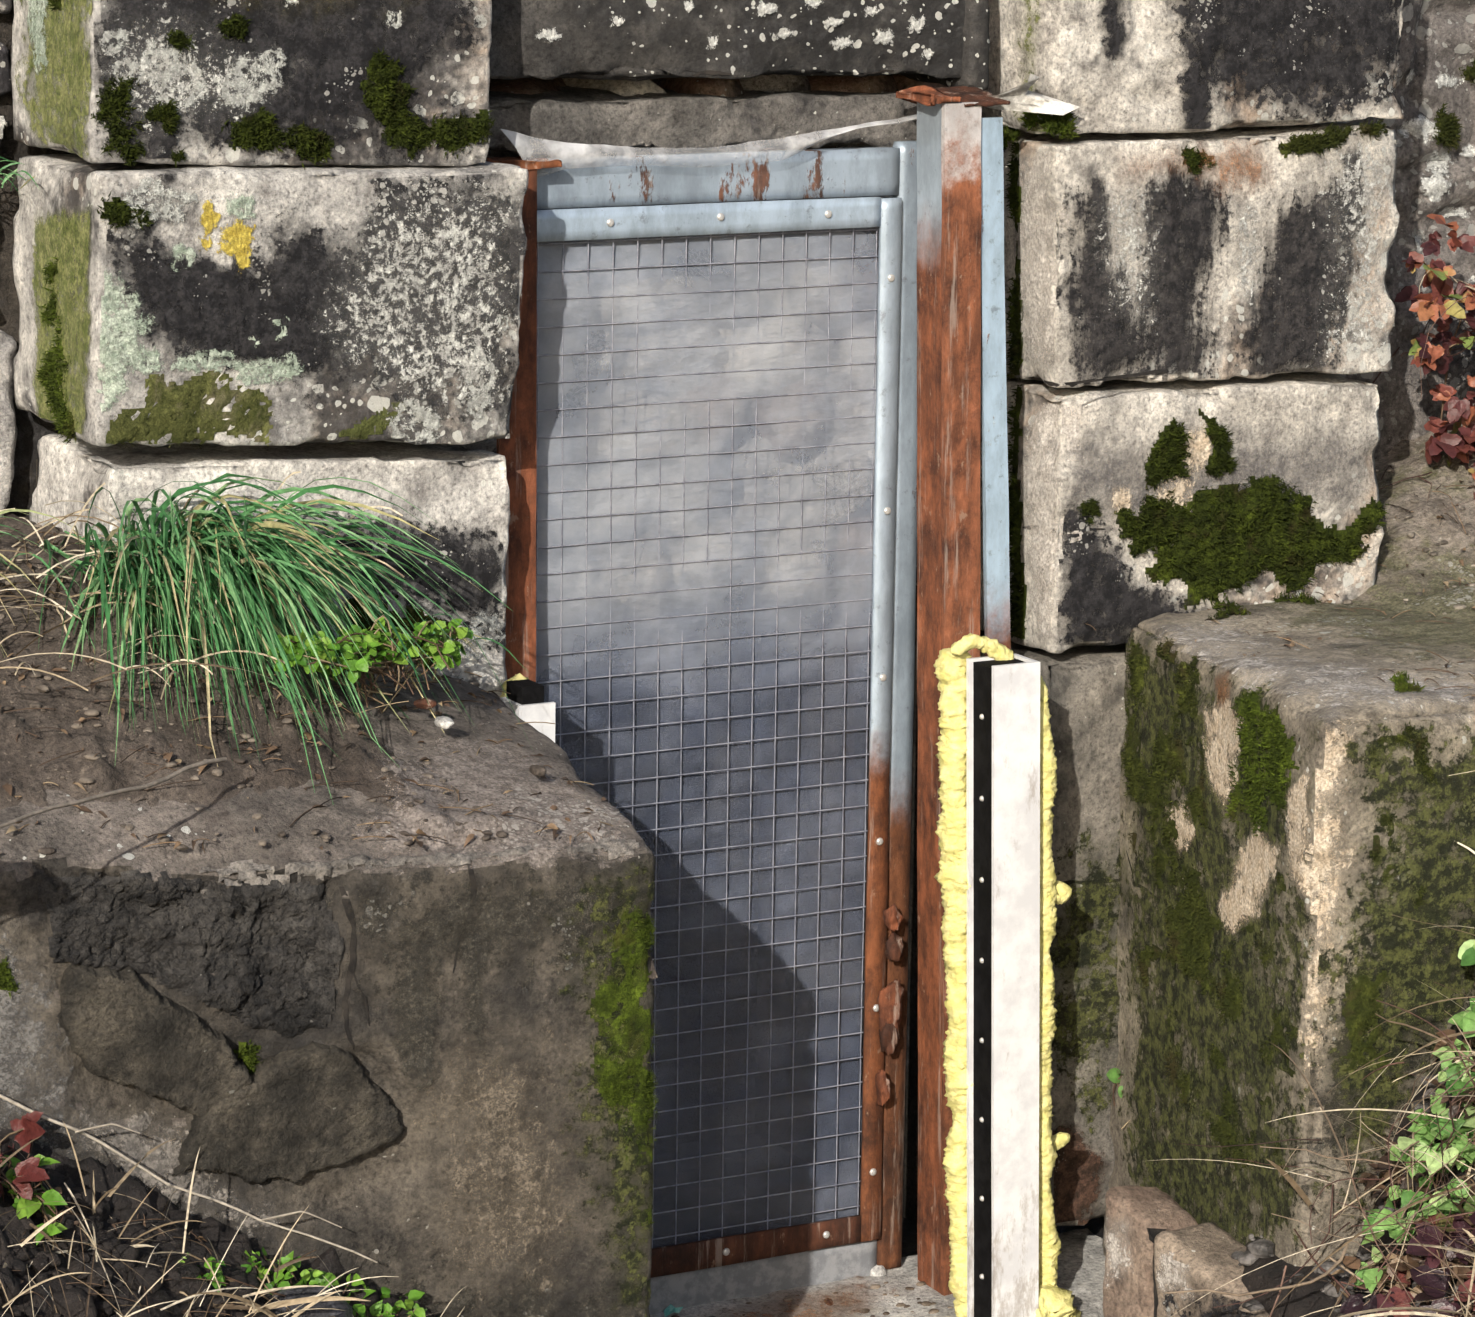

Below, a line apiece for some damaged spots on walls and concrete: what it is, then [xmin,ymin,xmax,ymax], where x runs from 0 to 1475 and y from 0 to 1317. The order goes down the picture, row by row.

spalling [32,720,640,1038]
rust [875,903,905,1106]
peeling [413,1021,591,1307]